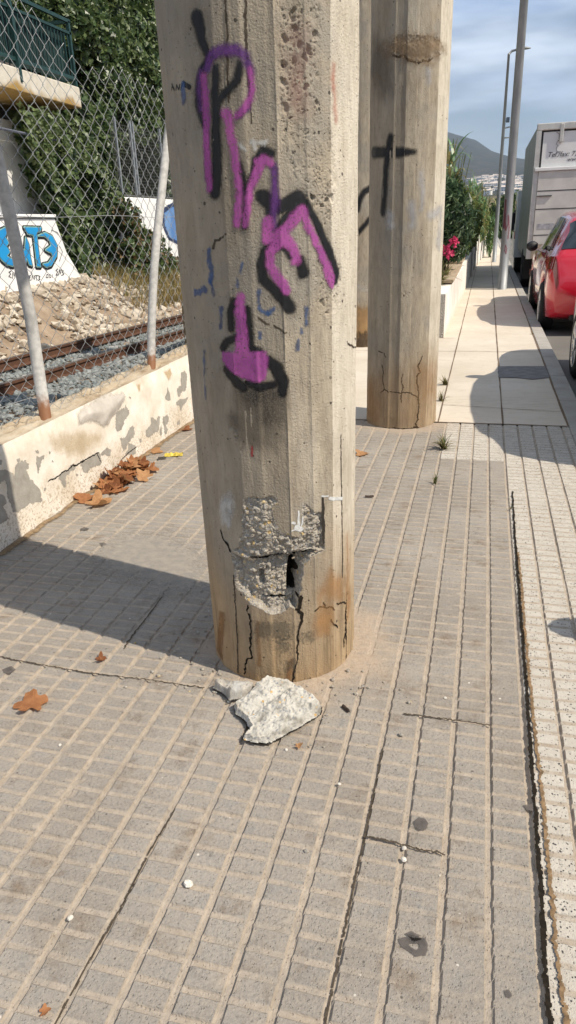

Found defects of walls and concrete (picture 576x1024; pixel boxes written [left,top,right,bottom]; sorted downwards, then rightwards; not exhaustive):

peeling [0,450,53,524]
crack [48,447,136,482]
peeling [59,371,188,487]
crack [347,341,423,429]
crack [220,530,253,675]
spalling [230,495,326,615]
crack [292,439,347,682]